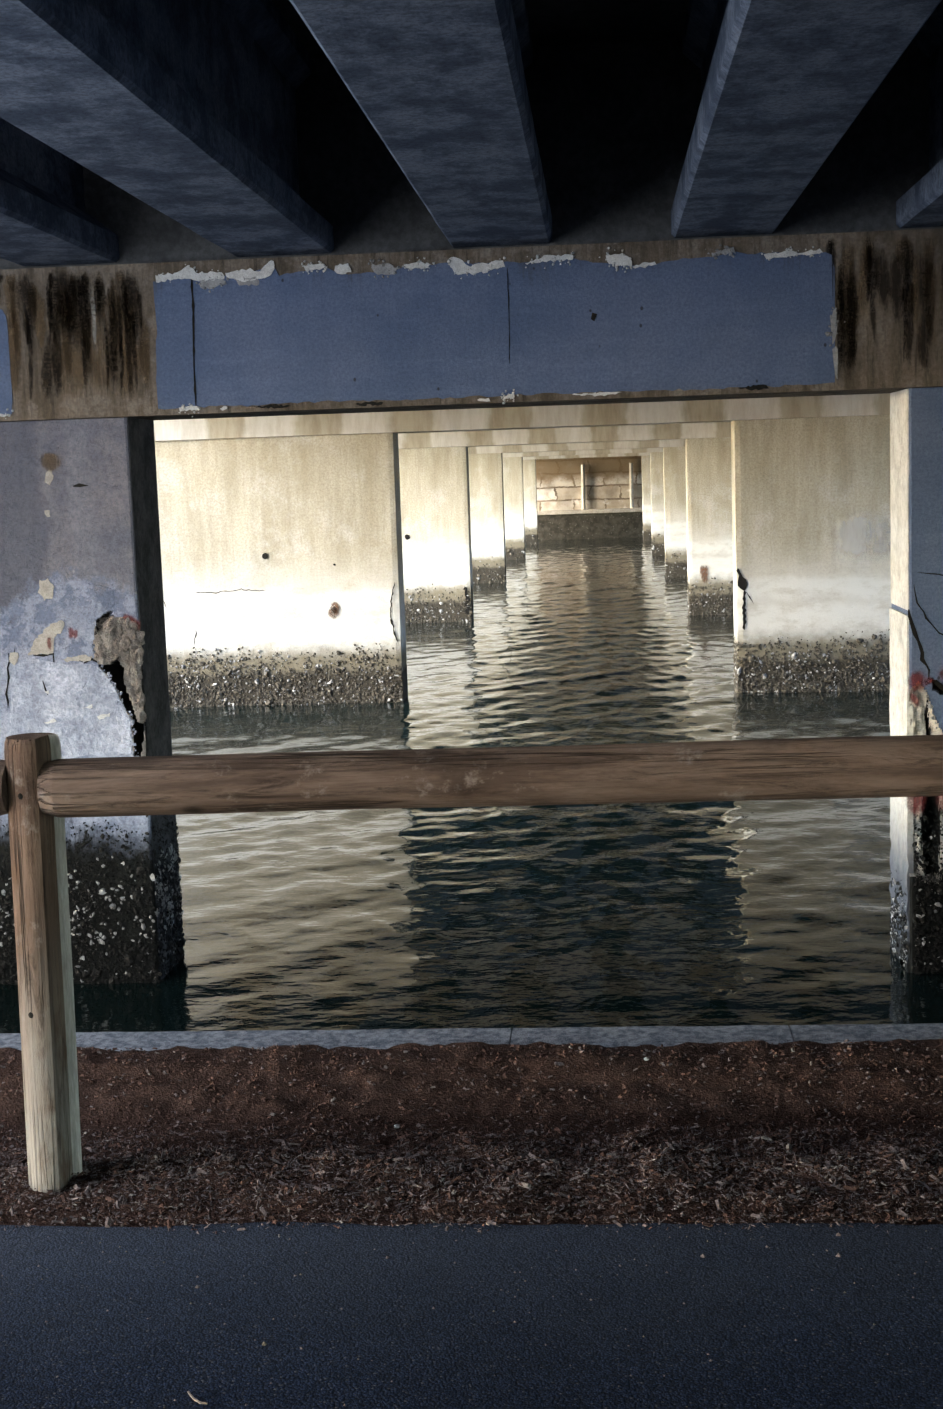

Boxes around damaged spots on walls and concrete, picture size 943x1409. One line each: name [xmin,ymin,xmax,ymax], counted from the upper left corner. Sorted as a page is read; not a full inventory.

peeling [155,260,275,293]
peeling [301,260,351,274]
peeling [368,257,506,279]
peeling [525,252,574,269]
peeling [599,247,656,273]
peeling [761,246,822,261]
leakage [826,238,943,370]
leakage [0,271,150,397]
crack [736,569,753,630]
crack [908,572,943,691]
peeling [9,611,147,759]